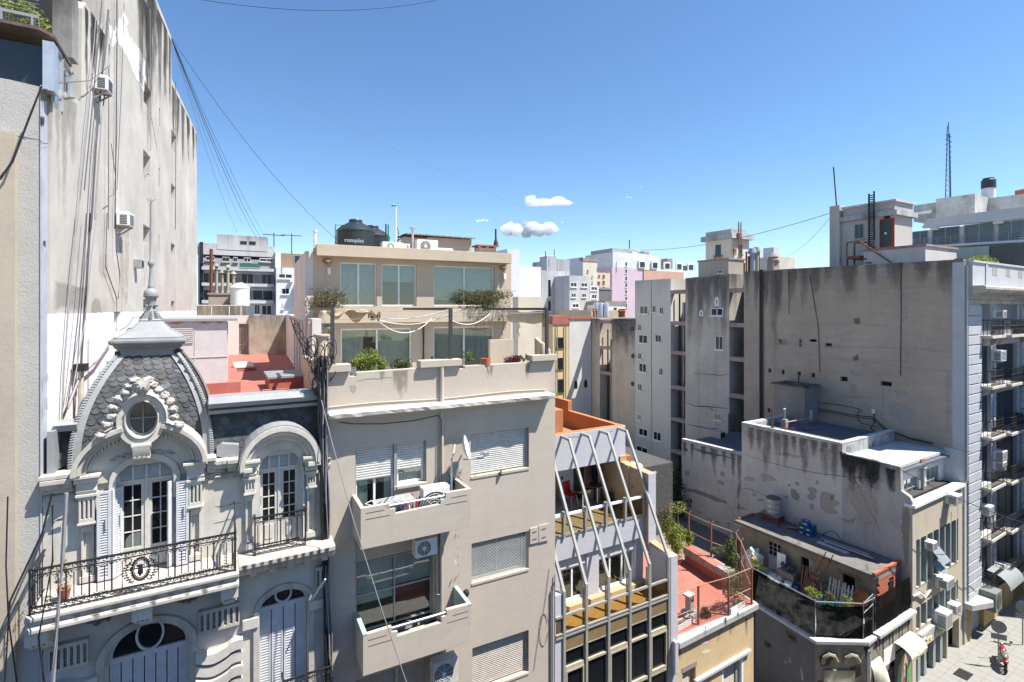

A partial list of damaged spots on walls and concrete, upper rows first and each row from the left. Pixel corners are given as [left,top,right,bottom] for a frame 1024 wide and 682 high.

damp [85,7,105,65]
damp [139,0,197,153]
damp [745,267,830,302]
damp [915,260,952,272]
damp [683,442,741,474]
damp [749,427,895,490]
flaking render [744,473,856,523]